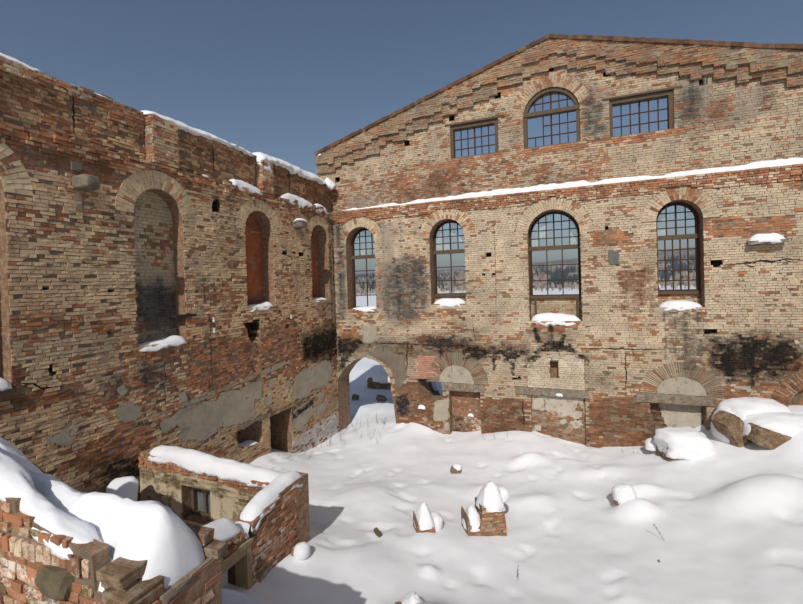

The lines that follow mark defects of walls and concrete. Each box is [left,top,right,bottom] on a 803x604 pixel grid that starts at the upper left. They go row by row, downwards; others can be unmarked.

crack [724,258,803,267]
leakage [533,324,566,347]
flaking render [46,318,299,474]
flaking render [285,360,332,431]